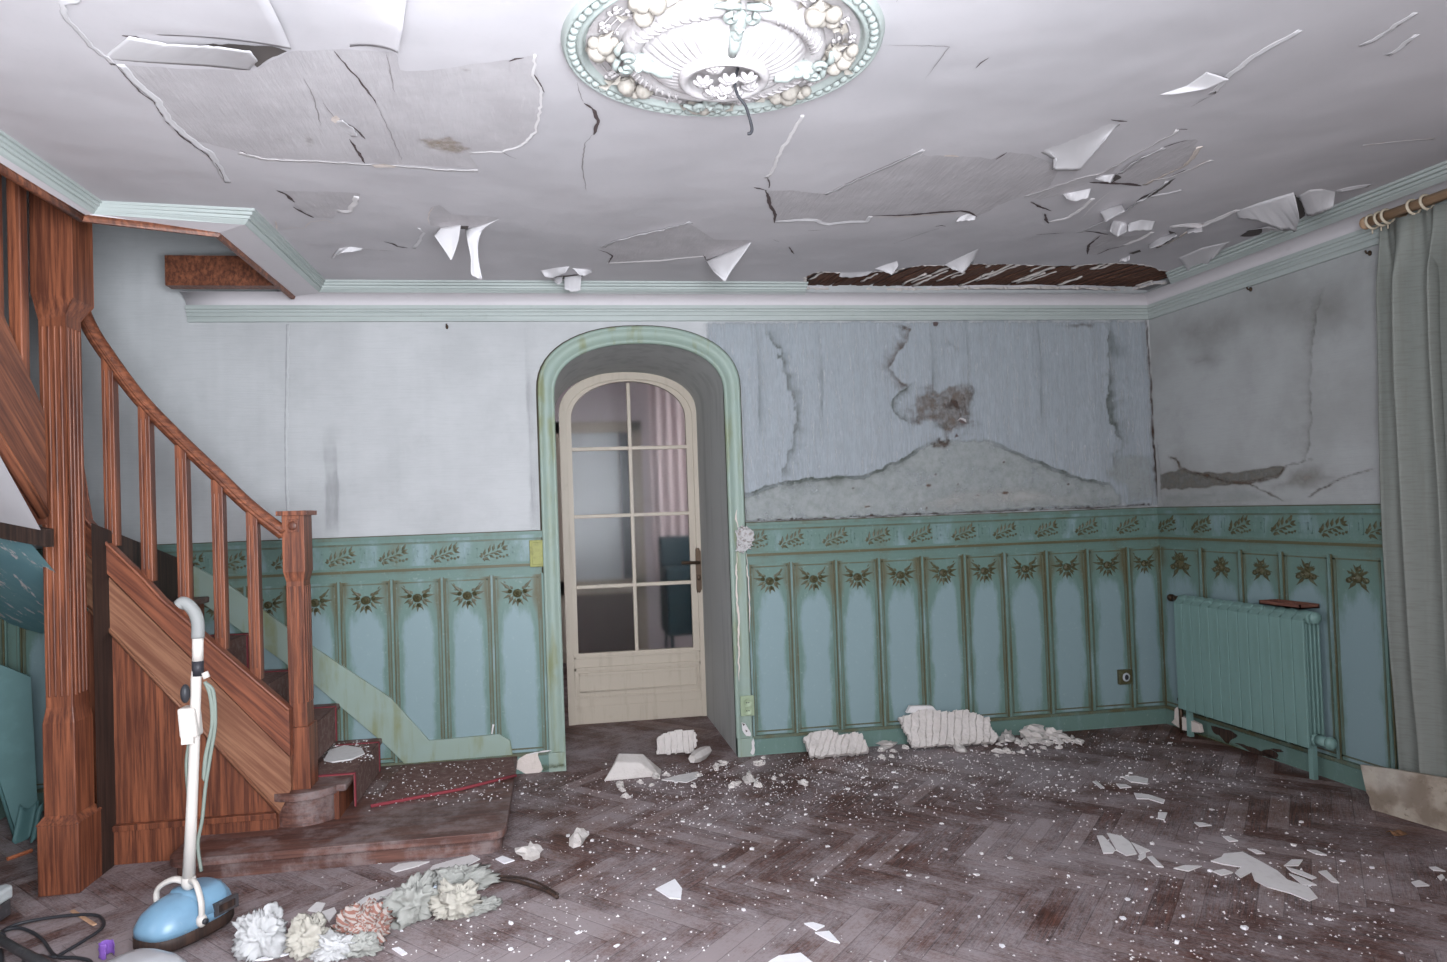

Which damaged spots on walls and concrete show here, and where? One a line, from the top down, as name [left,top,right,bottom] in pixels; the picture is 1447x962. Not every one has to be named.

peeling [58,0,544,183]
crack [577,83,600,191]
peeling [428,205,499,279]
peeling [541,266,592,292]
peeling [600,221,752,282]
peeling [754,115,1372,291]
damp [708,320,1325,521]